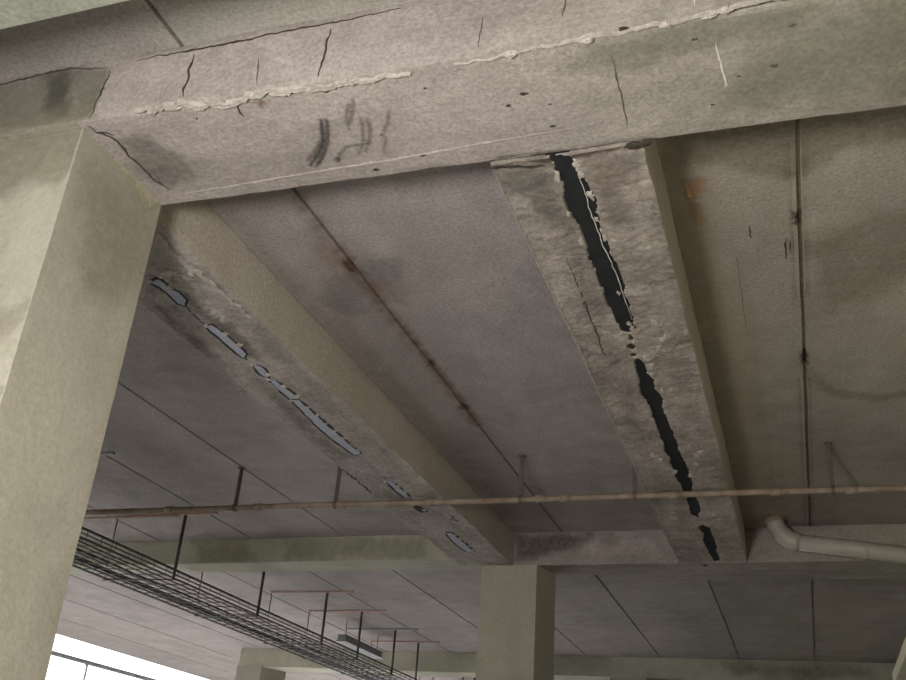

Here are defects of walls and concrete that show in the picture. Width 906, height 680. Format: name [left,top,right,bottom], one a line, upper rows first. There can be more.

crack [137,8,400,97]
crack [0,67,170,190]
spalling [147,277,189,307]
crack [567,259,606,356]
spalling [203,324,362,456]
spalling [383,480,428,513]